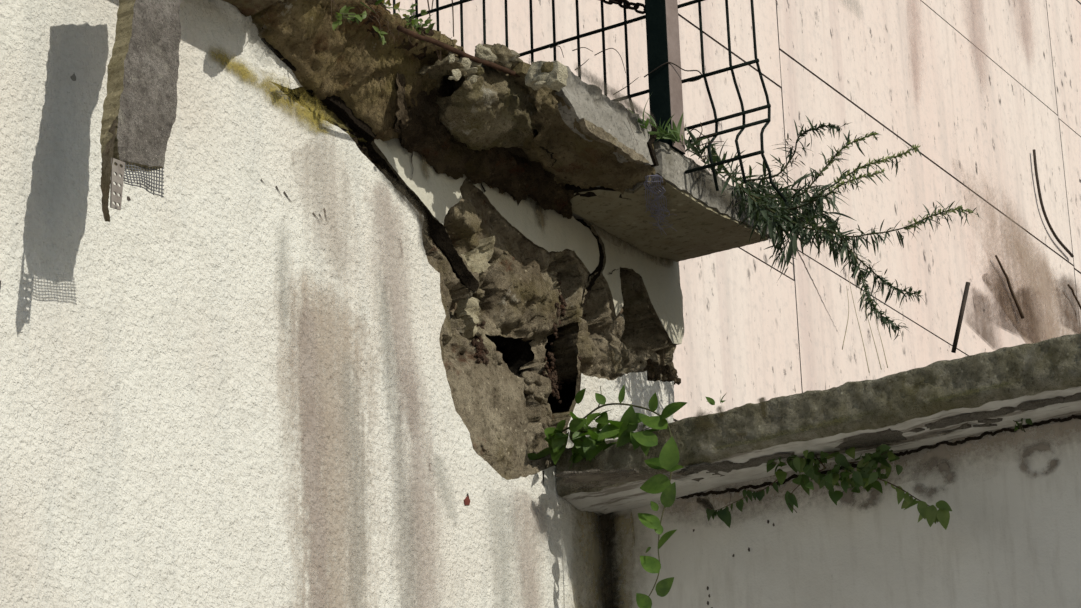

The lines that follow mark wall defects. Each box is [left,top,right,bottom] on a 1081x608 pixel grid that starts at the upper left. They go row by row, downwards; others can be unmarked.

damp [211,50,258,85]
spalling [121,161,164,201]
crack [261,27,479,292]
crack [540,118,659,306]
spalling [578,118,675,234]
damp [377,172,427,390]
spalling [422,179,677,483]
damp [289,282,365,608]
peeling [676,452,795,482]
damp [665,412,1081,515]
peeling [835,392,1081,450]
damp [575,511,635,608]